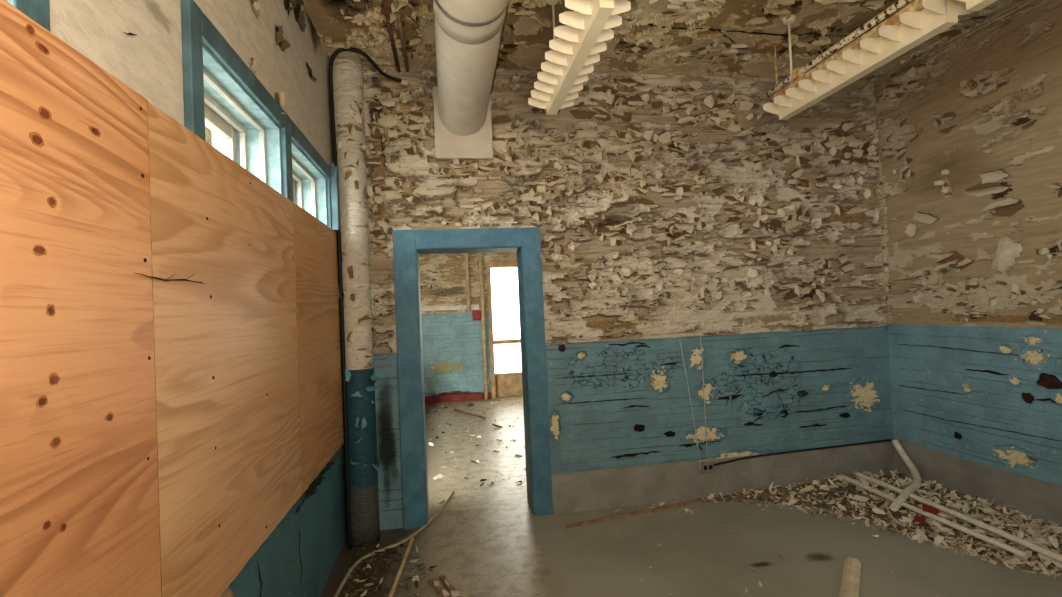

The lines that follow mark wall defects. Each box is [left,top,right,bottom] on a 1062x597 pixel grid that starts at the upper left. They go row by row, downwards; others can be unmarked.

peeling [748,0,897,25]
peeling [777,27,861,57]
peeling [332,86,430,253]
peeling [428,72,918,310]
peeling [934,168,1025,217]
crack [136,273,205,284]
peeling [904,250,1062,365]
crack [608,342,681,369]
crack [564,373,650,408]
crack [716,345,850,428]
water stain [378,389,396,487]
crack [611,440,721,459]